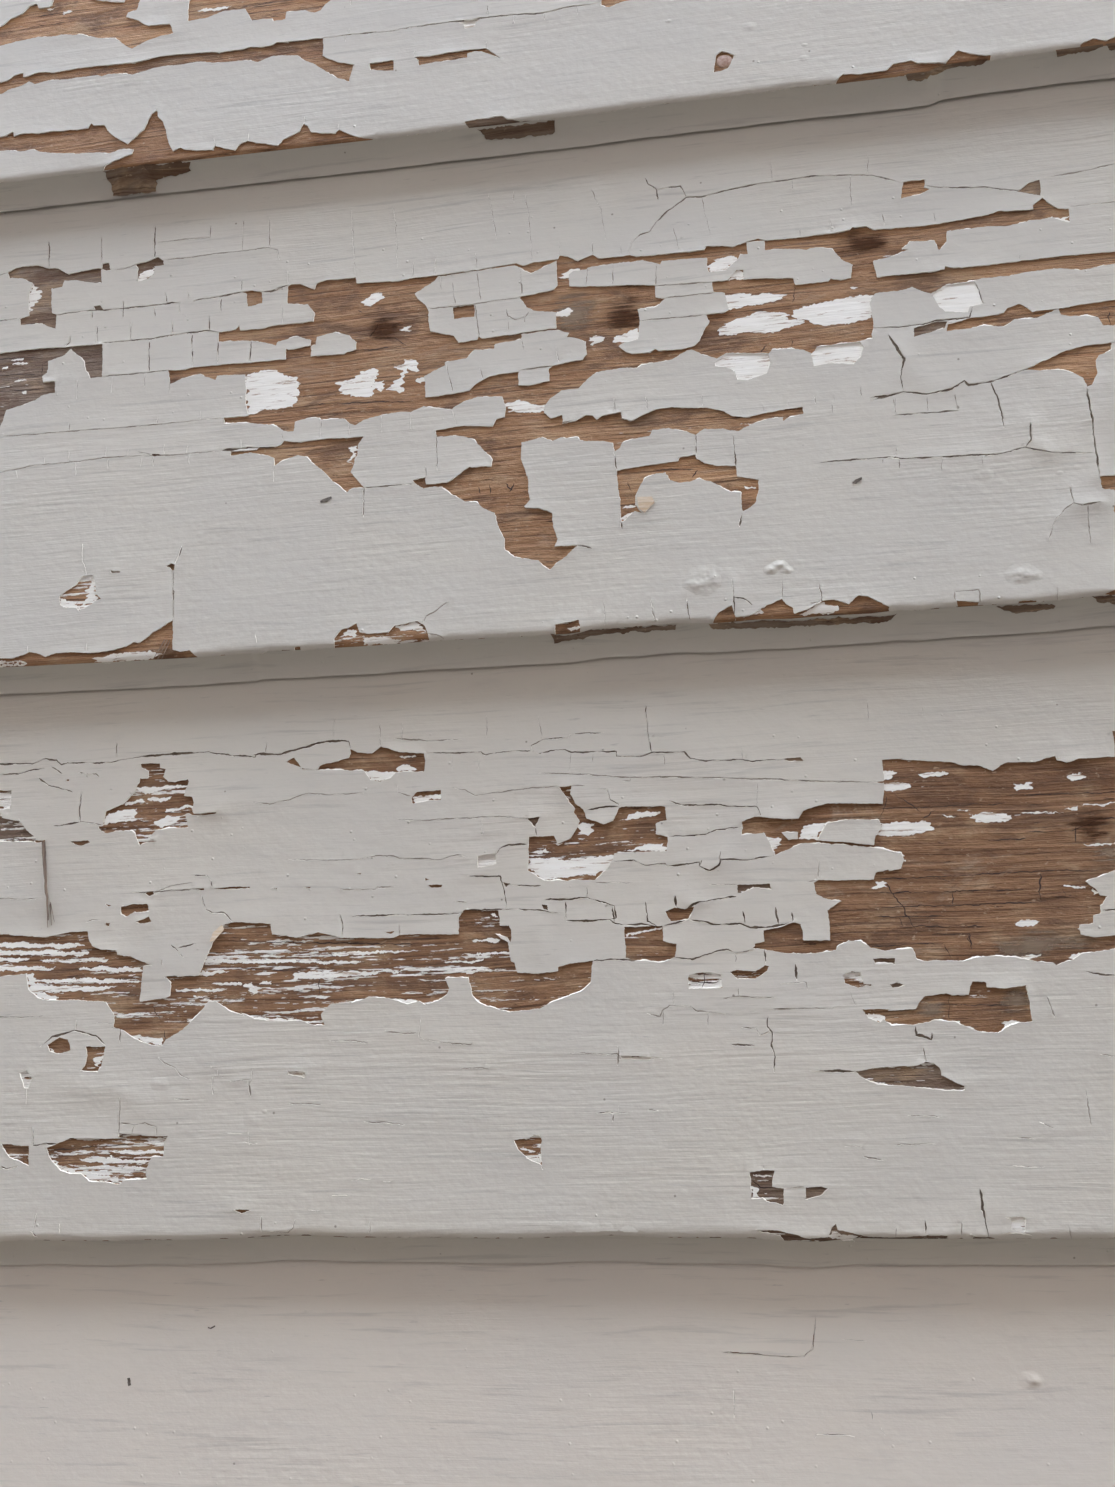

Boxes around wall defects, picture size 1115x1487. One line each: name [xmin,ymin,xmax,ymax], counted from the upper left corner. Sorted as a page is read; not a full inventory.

peeling [0,0,394,94]
peeling [0,111,373,196]
crack [639,160,890,321]
crack [930,163,1115,218]
peeling [0,344,103,426]
crack [393,194,559,464]
peeling [168,180,1115,569]
crack [0,708,860,1069]
peeling [528,786,668,881]
peeling [688,731,1115,989]
peeling [0,910,593,1046]
peeling [863,981,1032,1033]